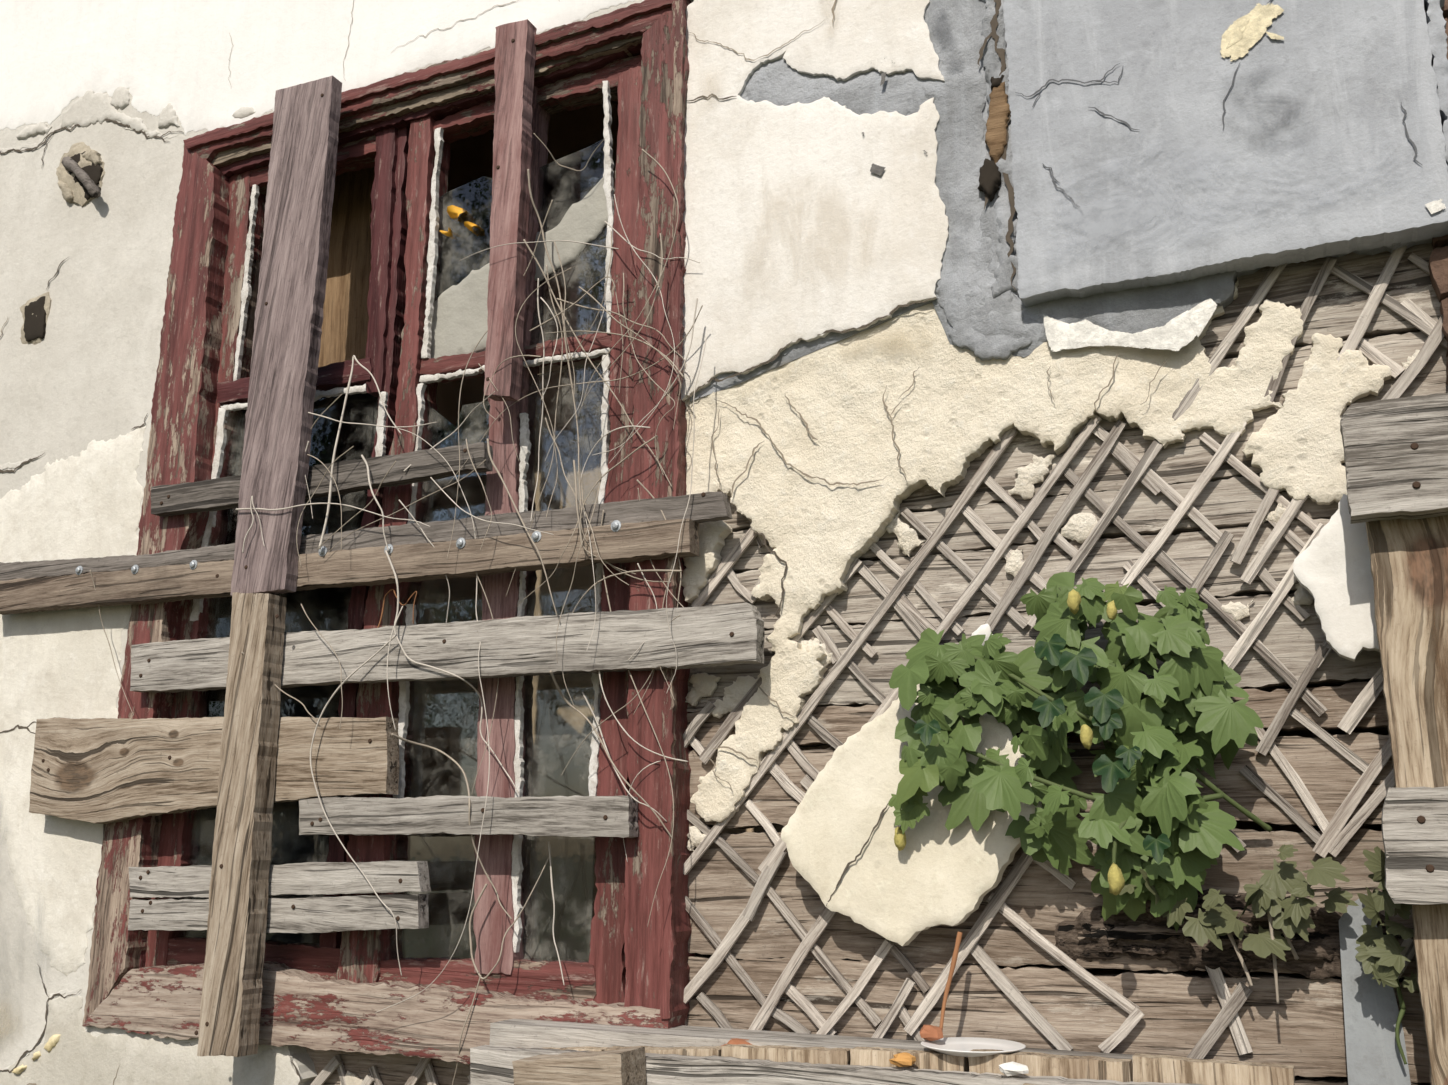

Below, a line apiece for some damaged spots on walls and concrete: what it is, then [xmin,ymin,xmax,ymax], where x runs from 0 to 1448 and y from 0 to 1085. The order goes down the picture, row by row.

crack [1222,63,1240,129]
crack [0,119,184,169]
peeling [16,86,180,207]
crack [1401,102,1422,165]
peeling [743,0,1217,361]
spalling [20,292,52,345]
crack [682,298,931,496]
crack [0,449,47,472]
crack [750,528,787,618]
crack [0,721,35,734]
crack [0,963,83,1085]